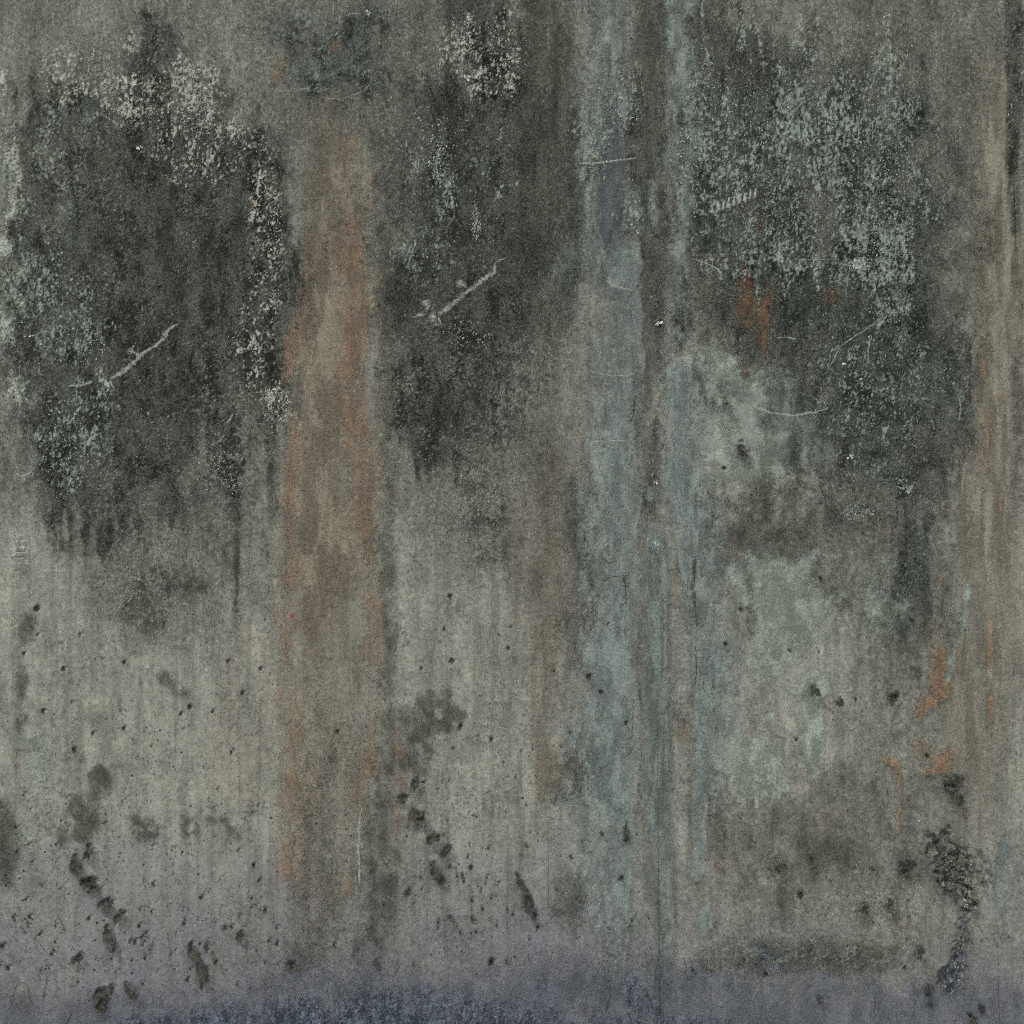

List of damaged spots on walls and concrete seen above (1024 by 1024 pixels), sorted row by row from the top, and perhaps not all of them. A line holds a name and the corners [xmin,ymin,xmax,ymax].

water stain [0,8,313,620]
rust [280,97,385,880]
water stain [0,373,792,1024]
water stain [372,0,1024,815]
water stain [790,978,1024,1024]